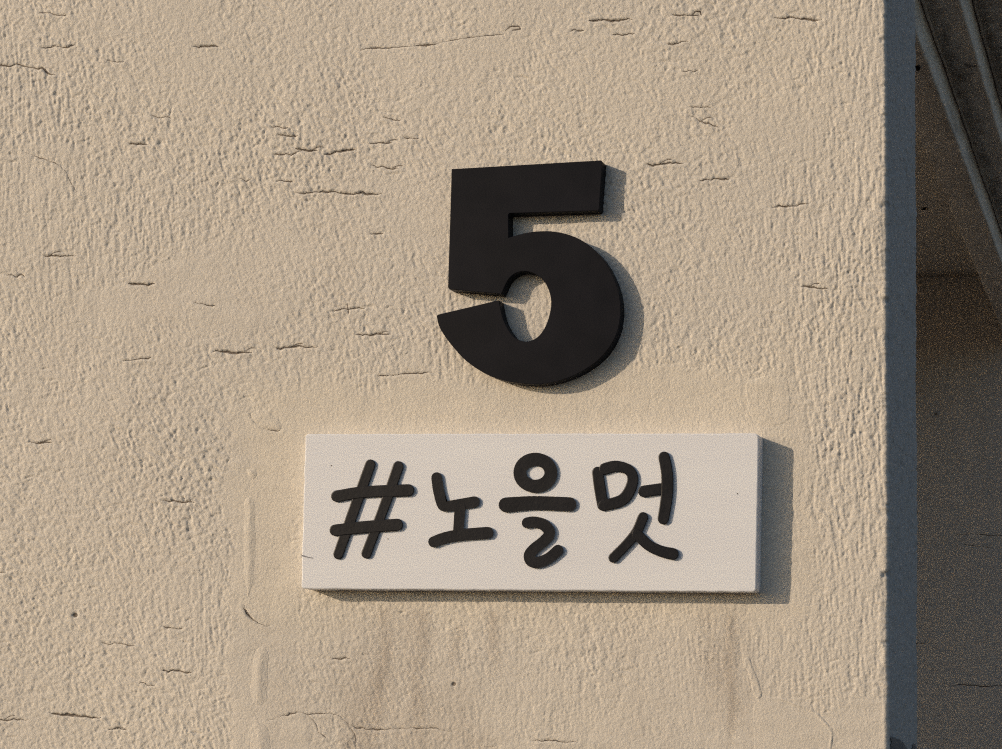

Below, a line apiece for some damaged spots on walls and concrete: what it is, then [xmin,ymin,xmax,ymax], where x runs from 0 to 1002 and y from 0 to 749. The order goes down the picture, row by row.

crack [774,14,817,22]
crack [362,25,520,50]
crack [0,45,73,75]
crack [271,117,417,170]
crack [276,180,382,195]
crack [213,343,313,354]
crack [49,712,127,730]